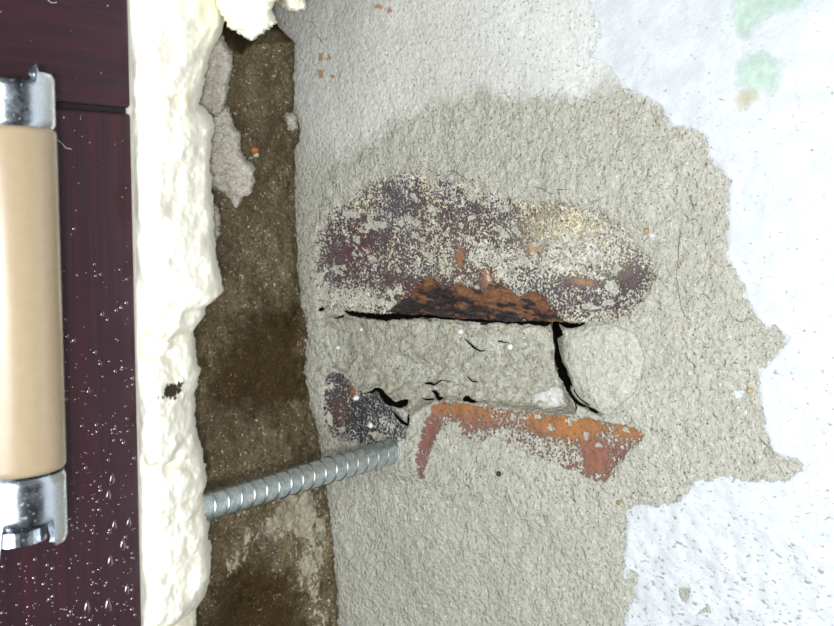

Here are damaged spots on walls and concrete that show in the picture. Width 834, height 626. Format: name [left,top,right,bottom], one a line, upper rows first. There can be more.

water stain [210,310,304,409]
crack [364,376,477,426]
crack [319,307,599,414]
peeling [299,0,834,626]
water stain [207,565,335,626]